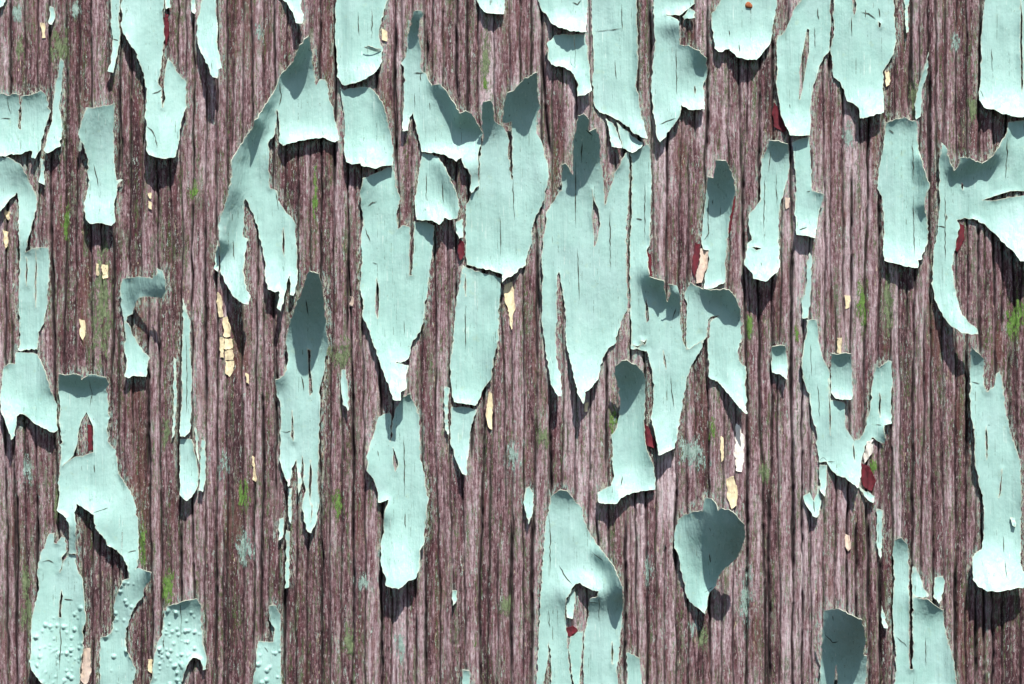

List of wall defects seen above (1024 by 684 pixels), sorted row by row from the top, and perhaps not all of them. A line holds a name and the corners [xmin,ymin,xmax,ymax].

peeling [108,0,187,159]
peeling [191,0,222,78]
peeling [0,58,151,684]
peeling [120,268,166,378]
peeling [172,300,206,501]
peeling [214,0,1024,592]
peeling [801,253,957,684]
peeling [150,599,207,684]
peeling [253,605,282,684]
peeling [462,669,470,684]
peeling [536,490,642,684]
peeling [674,497,746,614]